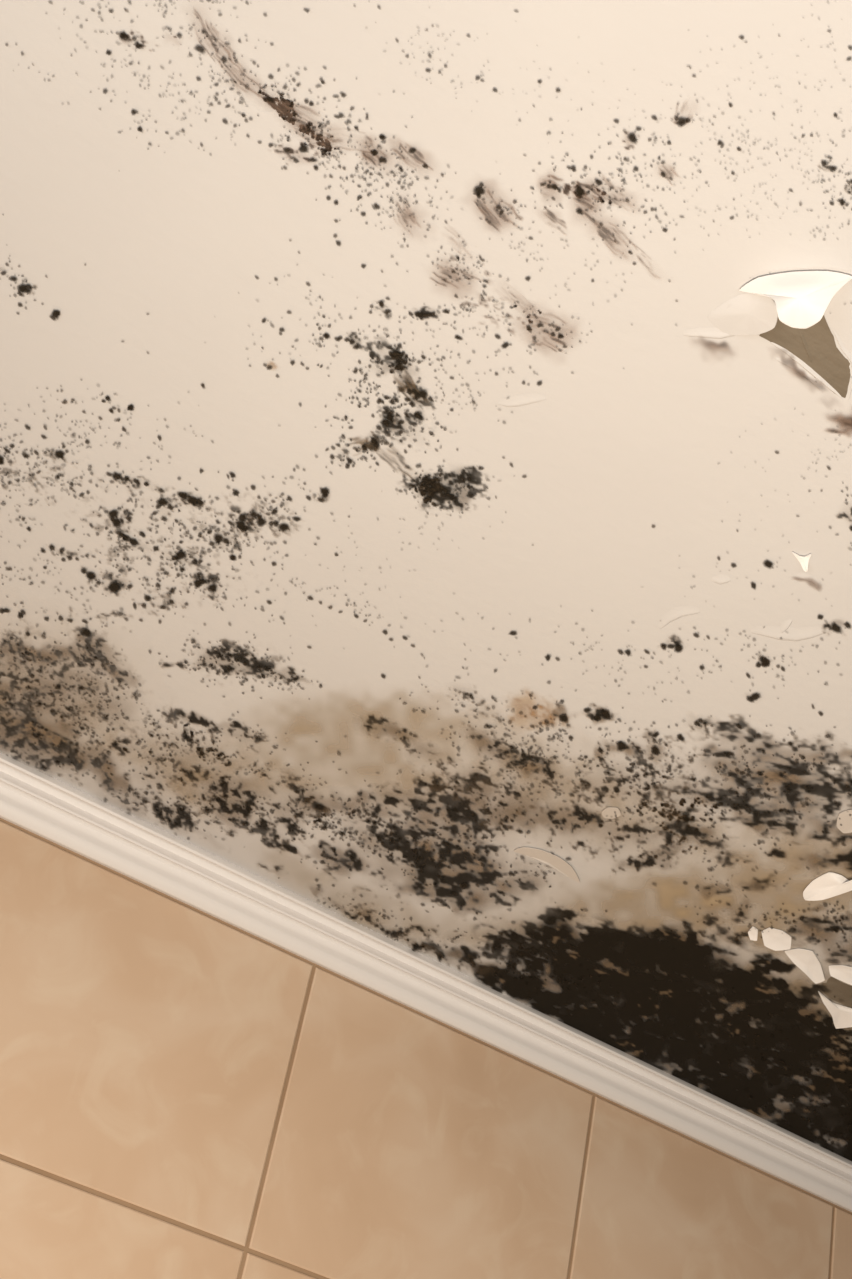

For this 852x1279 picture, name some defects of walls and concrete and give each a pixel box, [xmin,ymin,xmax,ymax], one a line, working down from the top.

water stain [116,32,145,49]
water stain [250,61,444,216]
water stain [474,120,672,240]
water stain [1,261,36,314]
water stain [369,297,449,323]
peeling [683,271,852,400]
water stain [0,425,68,485]
water stain [316,316,490,514]
water stain [828,416,852,434]
water stain [0,469,852,1161]
peeling [803,872,852,901]
peeling [748,926,852,1029]